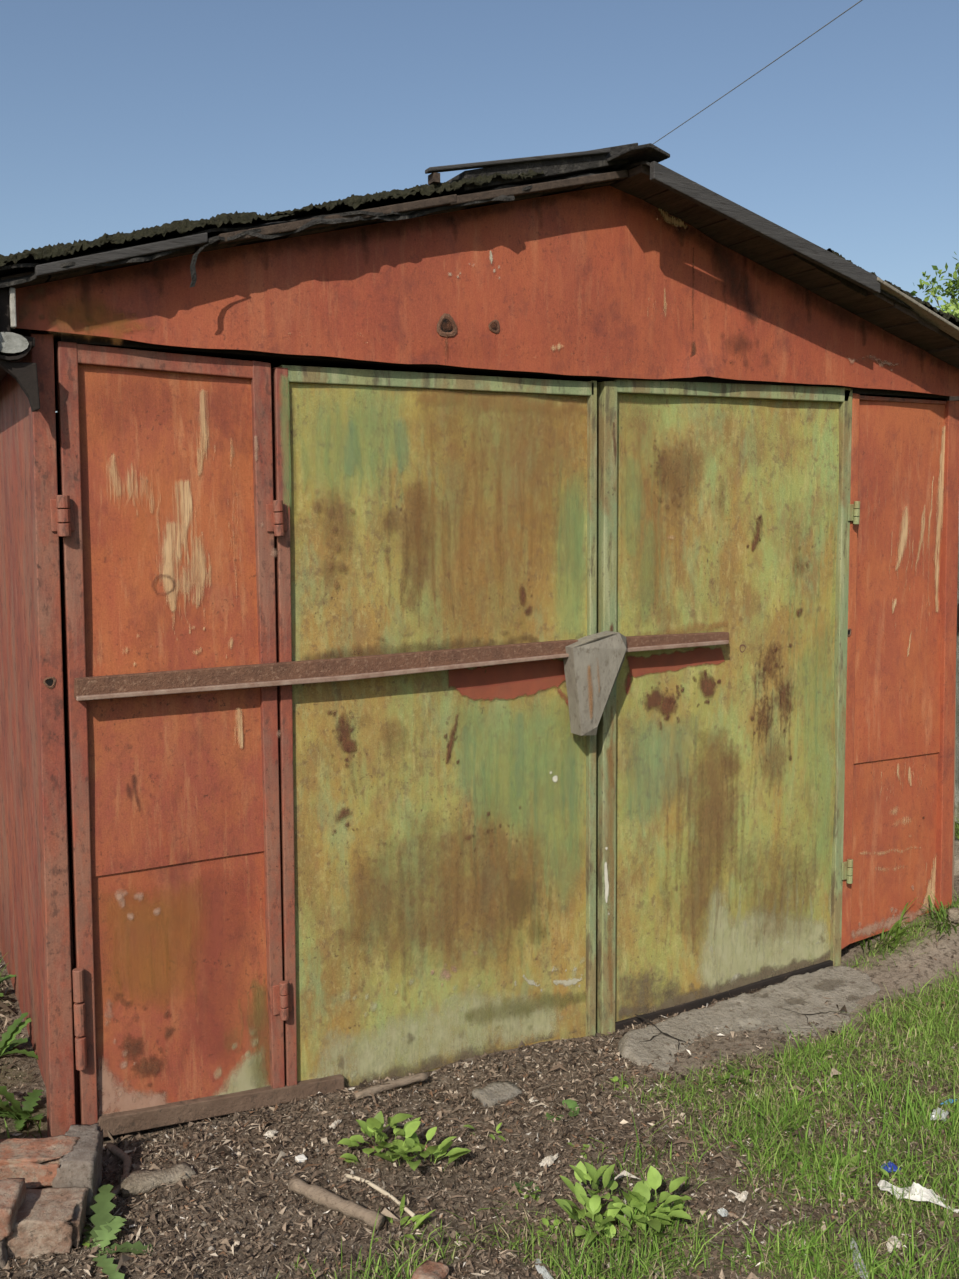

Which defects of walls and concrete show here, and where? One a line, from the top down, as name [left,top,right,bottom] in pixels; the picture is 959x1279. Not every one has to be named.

peeling [162,390,210,611]
rust [747,517,762,551]
peeling [889,426,945,611]
rust [751,644,792,734]
rust [328,711,355,765]
rust [444,715,459,764]
crack [634,1014,690,1051]